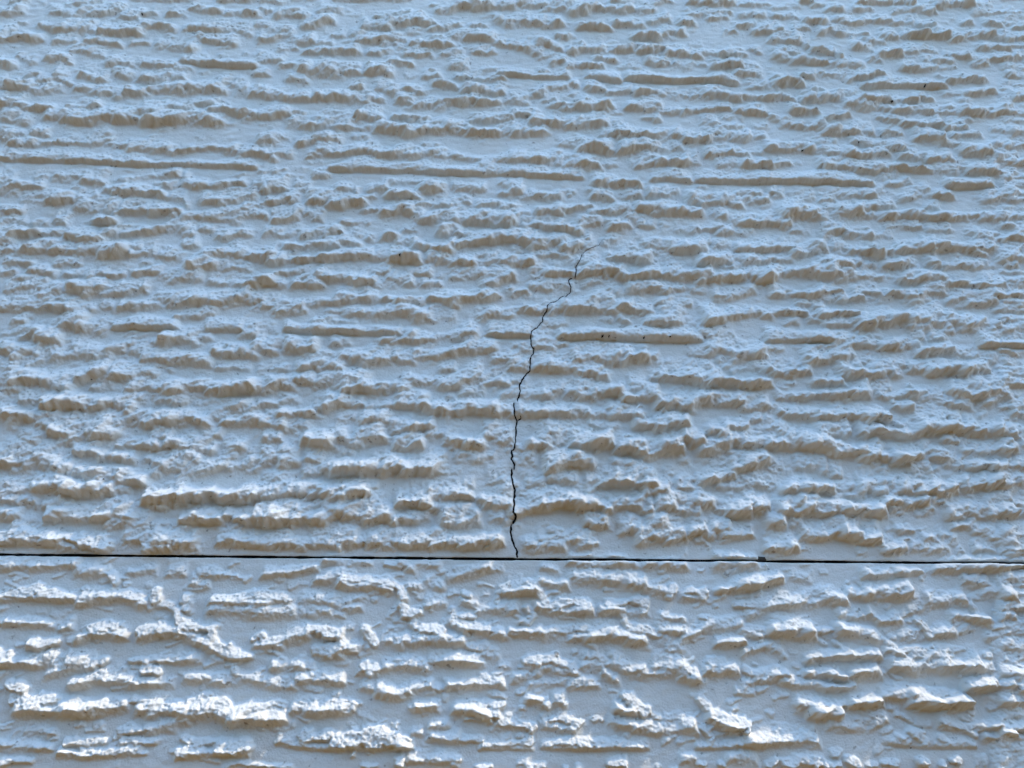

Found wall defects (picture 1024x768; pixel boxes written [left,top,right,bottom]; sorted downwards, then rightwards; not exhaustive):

crack [510,242,601,558]